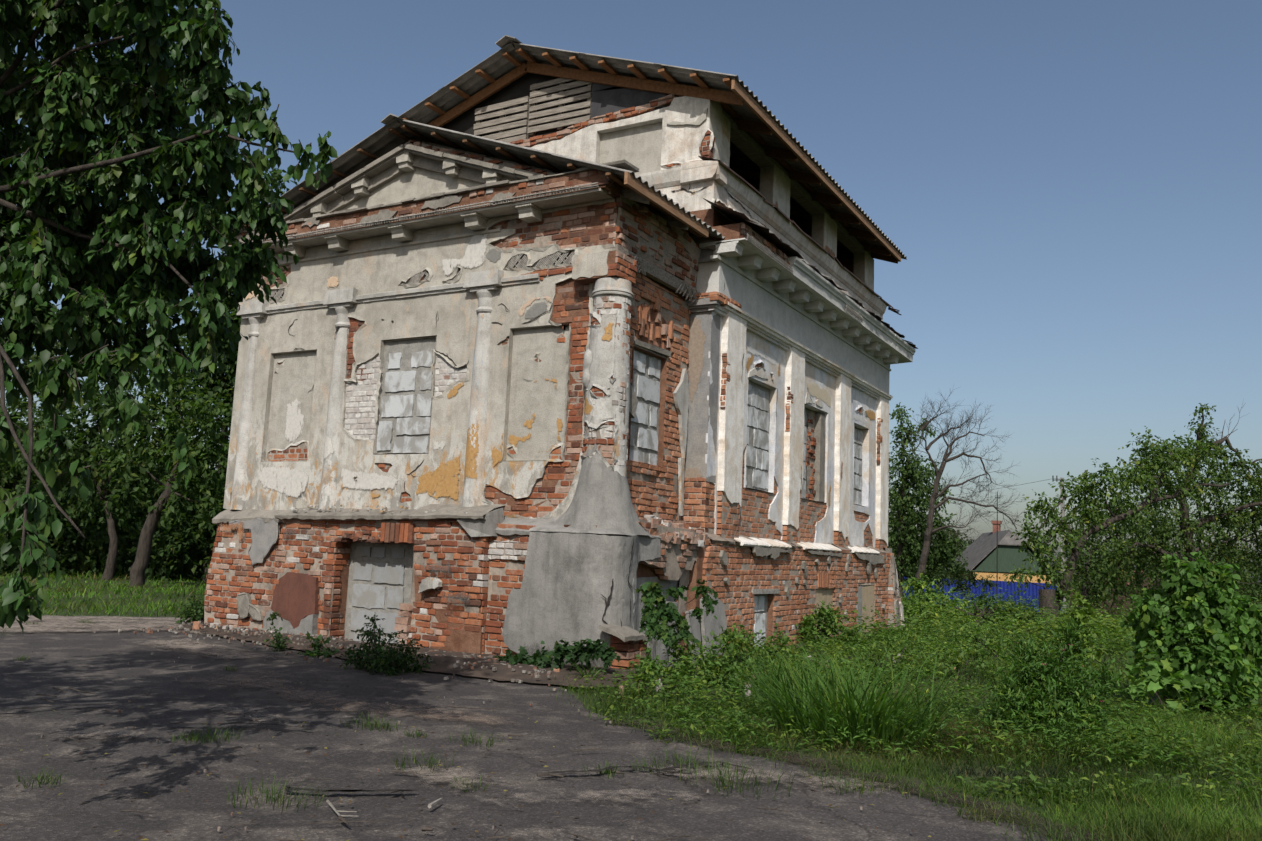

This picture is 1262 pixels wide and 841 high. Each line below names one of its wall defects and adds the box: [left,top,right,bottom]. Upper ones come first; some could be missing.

spalling [635,290,674,353]
flaking render [341,314,383,443]
flaking render [482,202,618,518]
spalling [720,353,730,409]
peeling [748,359,768,380]
spalling [855,405,883,465]
spalling [638,387,827,620]
flaking render [488,540,528,561]
flaking render [834,531,849,549]
flaking render [854,511,902,627]